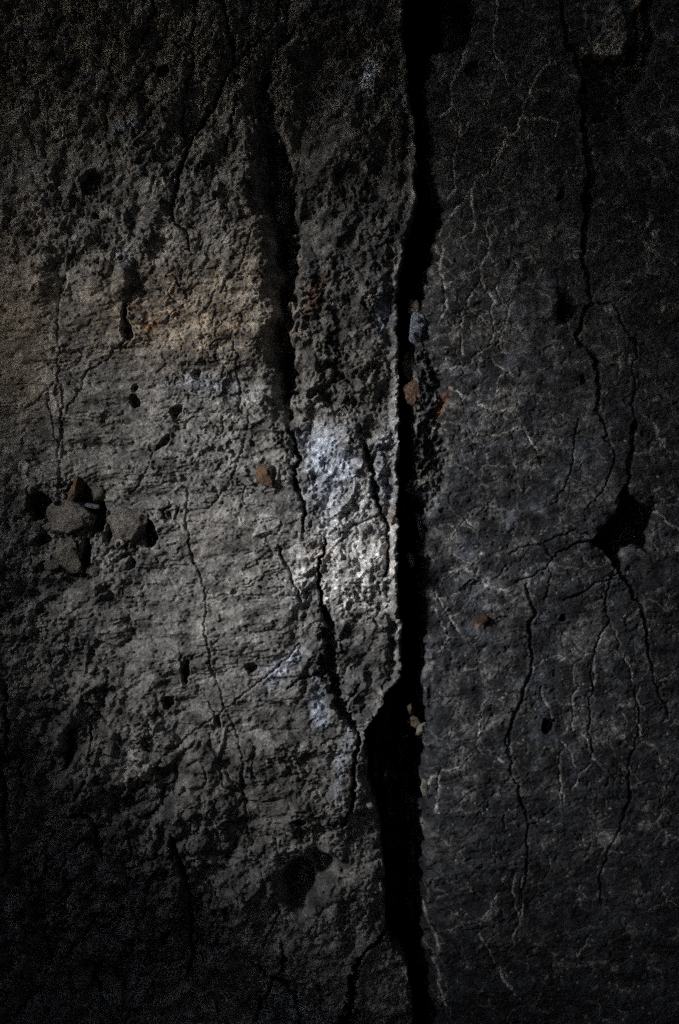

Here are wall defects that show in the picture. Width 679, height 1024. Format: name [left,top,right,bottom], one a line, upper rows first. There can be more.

crack [126,336,381,937]
crack [416,0,679,1003]
crack [341,902,388,1024]